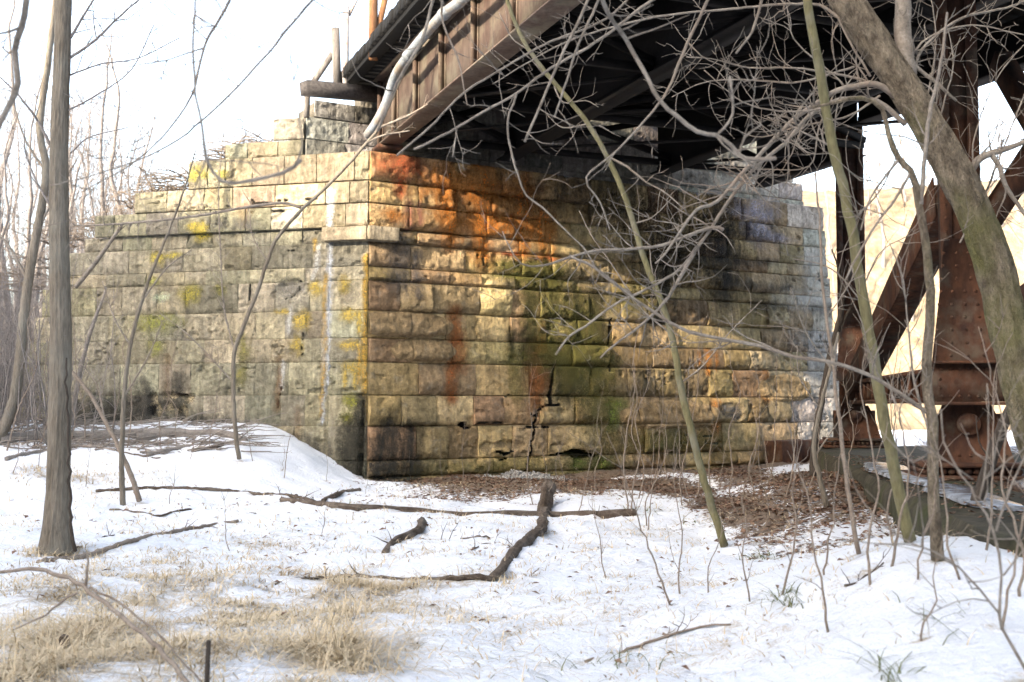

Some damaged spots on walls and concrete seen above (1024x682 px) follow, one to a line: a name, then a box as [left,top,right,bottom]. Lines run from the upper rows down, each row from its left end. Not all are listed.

rust [375,154,422,230]
rust [436,164,554,265]
efflorescence [315,247,332,367]
rust [445,307,466,403]
water stain [500,260,613,429]
crack [477,366,560,472]